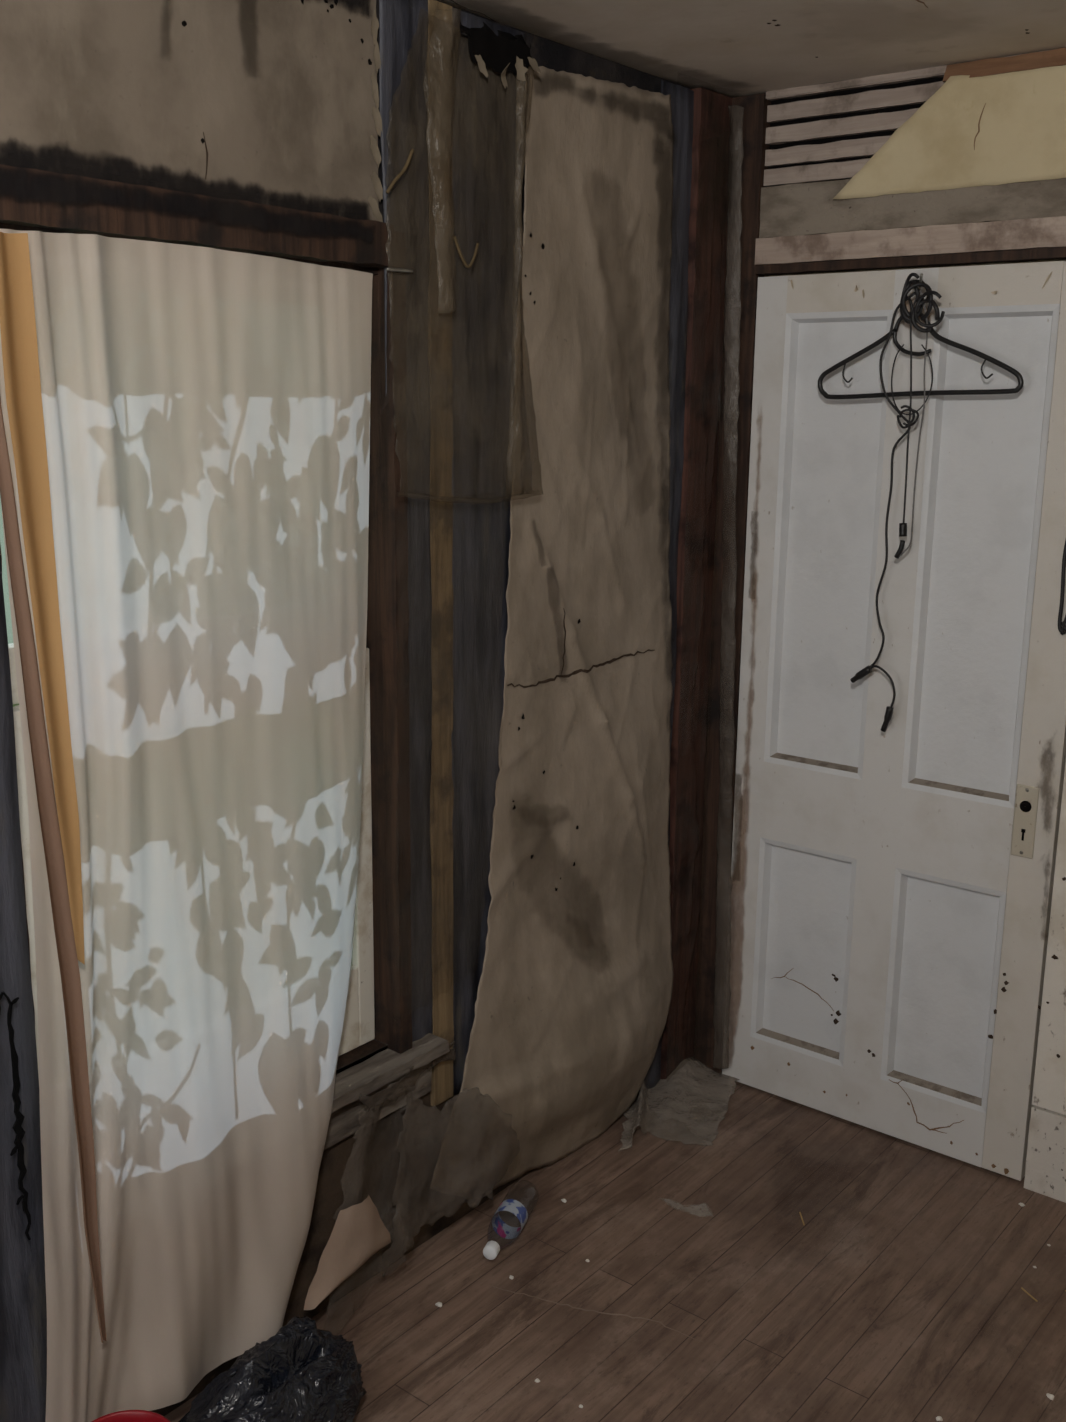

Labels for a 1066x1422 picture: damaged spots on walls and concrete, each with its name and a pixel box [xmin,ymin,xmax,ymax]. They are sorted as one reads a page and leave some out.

peeling [475,55,541,89]
leakage [0,167,374,243]
crack [507,608,655,688]
crack [0,991,31,1240]